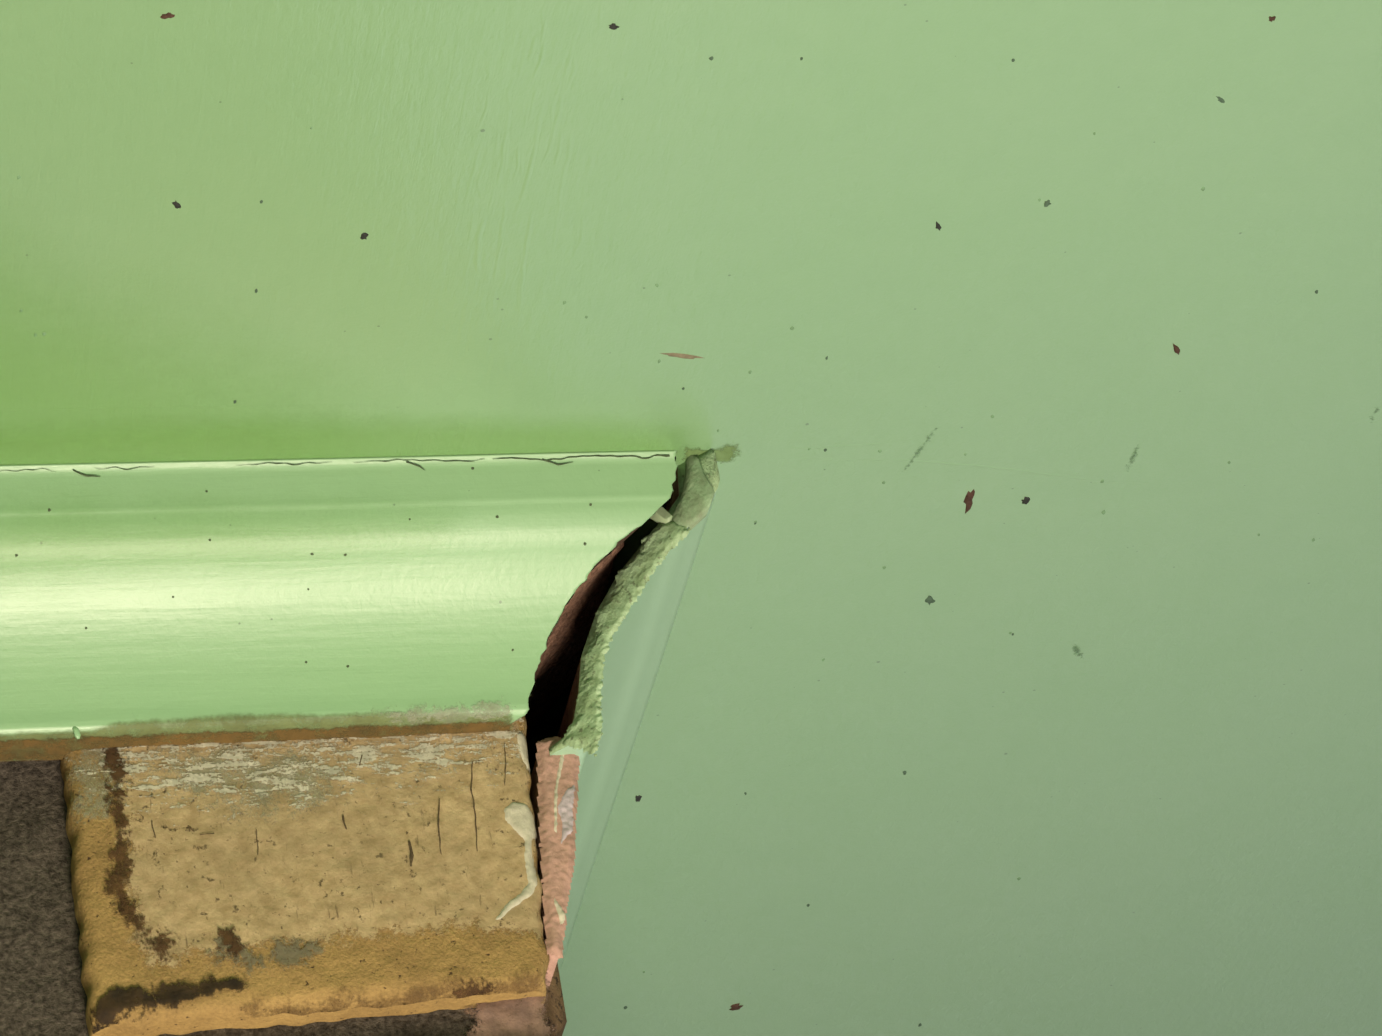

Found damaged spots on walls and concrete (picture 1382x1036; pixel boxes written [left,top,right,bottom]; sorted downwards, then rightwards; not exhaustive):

peeling [650,506,673,524]
leakage [102,747,180,961]